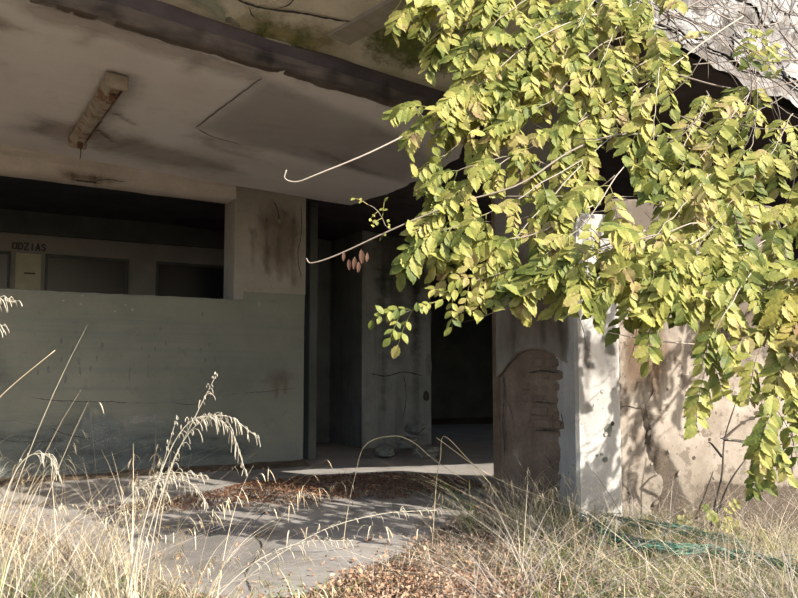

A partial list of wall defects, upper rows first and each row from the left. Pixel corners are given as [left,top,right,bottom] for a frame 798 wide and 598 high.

crack [238,0,351,23]
crack [196,78,262,145]
crack [37,388,297,405]
flaking render [496,343,568,516]